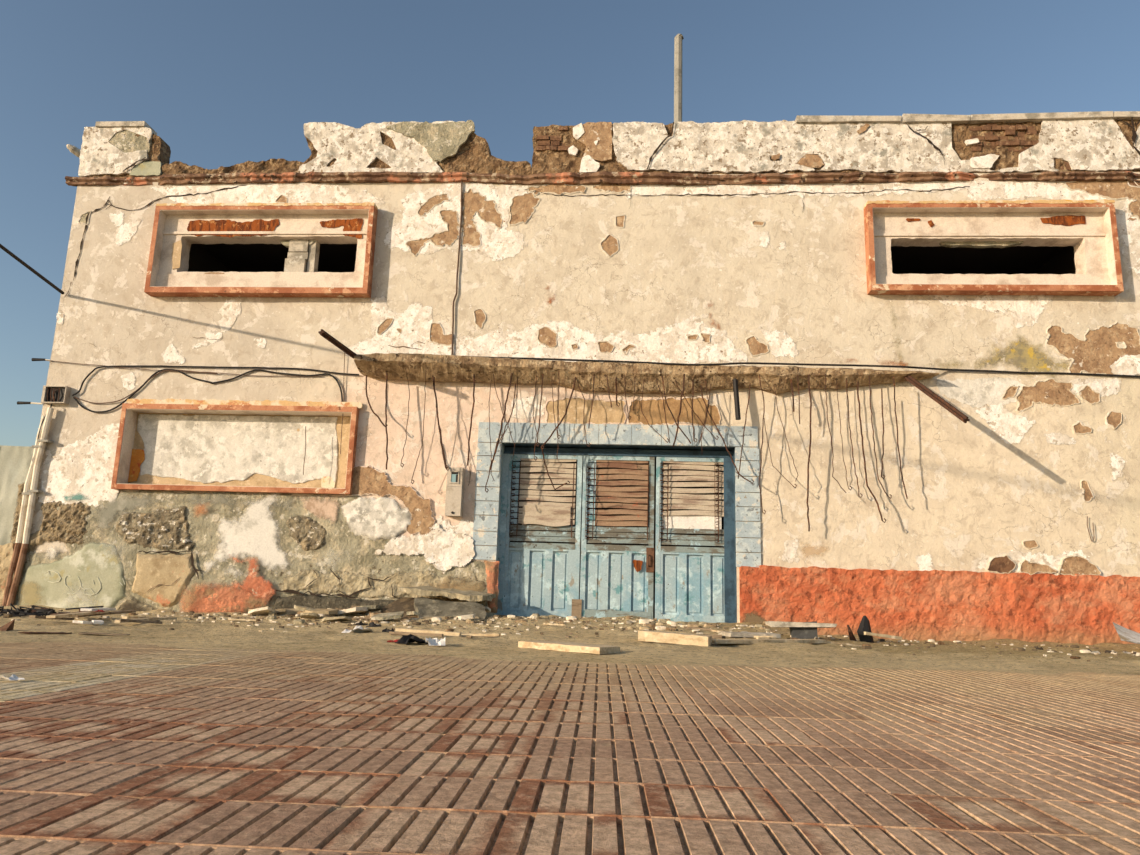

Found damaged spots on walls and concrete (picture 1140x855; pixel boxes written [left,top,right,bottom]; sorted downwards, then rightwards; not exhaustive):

peeling [172,240,182,269]
peeling [151,182,385,210]
peeling [384,123,1140,276]
crack [1117,118,1140,183]
peeling [161,297,243,364]
peeling [115,370,588,629]
peeling [345,295,812,531]
spalling [825,374,908,523]
flaking render [928,295,1140,445]
peeling [975,539,1103,576]